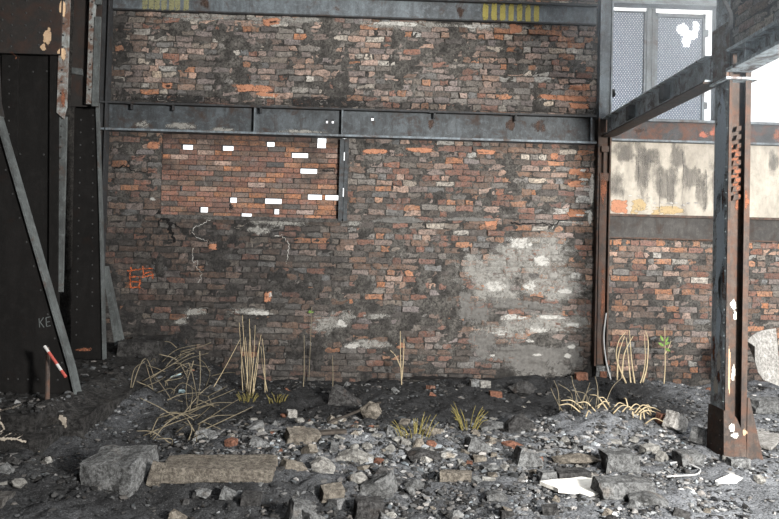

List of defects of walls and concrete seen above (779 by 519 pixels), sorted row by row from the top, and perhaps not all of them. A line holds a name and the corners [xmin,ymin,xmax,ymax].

peeling [40,27,51,51]
damp [616,142,714,210]
rust [731,145,750,210]
damp [457,234,583,304]
peeling [699,84,737,394]
damp [478,312,590,342]